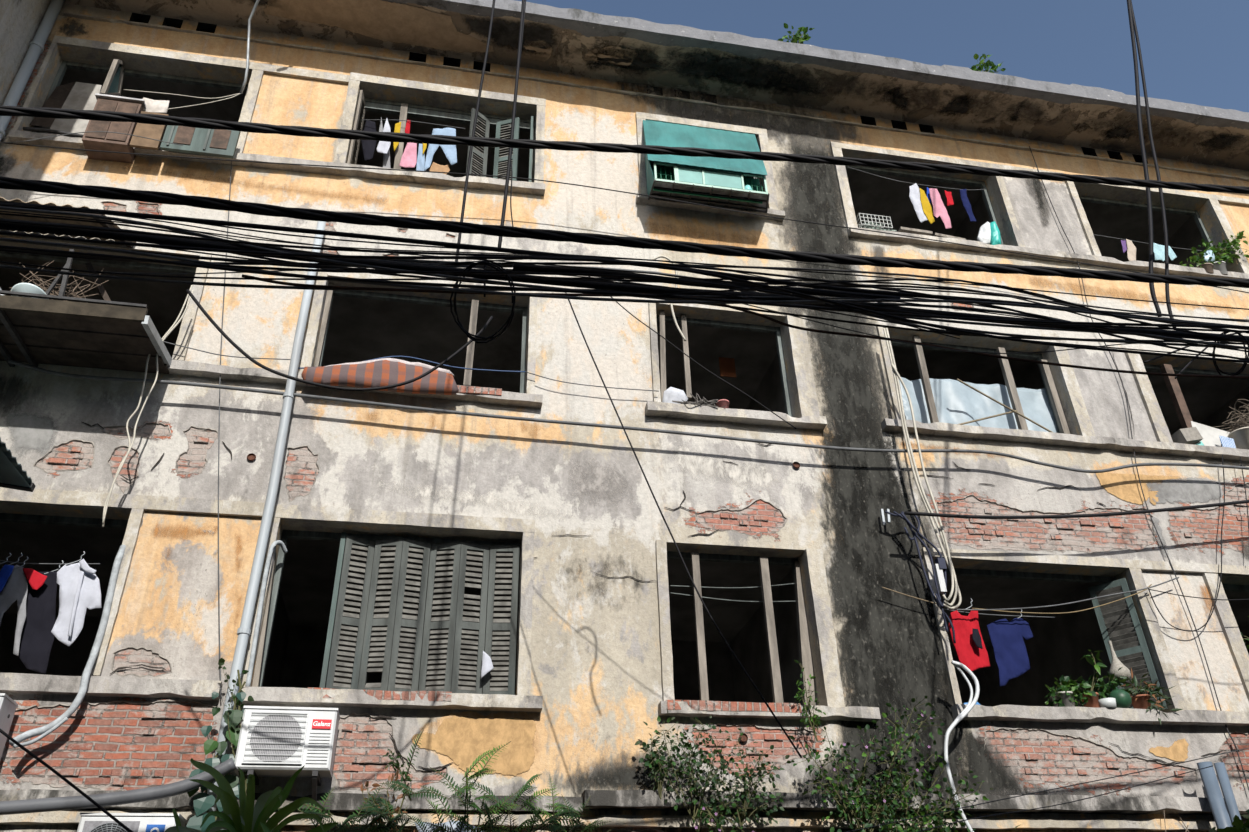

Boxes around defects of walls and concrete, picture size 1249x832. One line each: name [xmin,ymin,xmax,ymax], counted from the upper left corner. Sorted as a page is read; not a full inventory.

damp [463,17,559,55]
damp [567,47,1091,796]
spalling [7,414,218,493]
spalling [283,445,320,502]
damp [416,487,543,514]
spalling [683,491,788,542]
spalling [923,472,1249,557]
spalling [111,646,172,677]
spalling [0,694,220,792]
spalling [976,721,1198,796]
spalling [1218,731,1249,791]